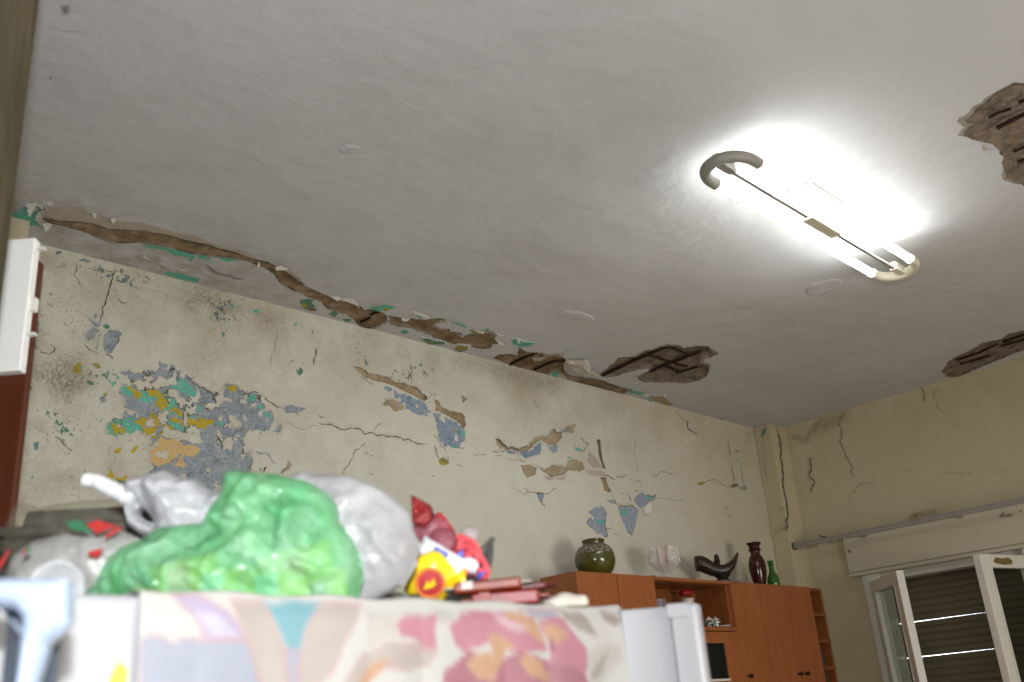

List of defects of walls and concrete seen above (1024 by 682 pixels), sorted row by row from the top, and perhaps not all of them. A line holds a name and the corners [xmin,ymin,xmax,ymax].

spalling [957,82,1024,186]
spalling [12,201,719,491]
spalling [941,330,1024,377]
crack [289,416,428,475]
peeling [492,424,656,539]
crack [747,412,869,532]